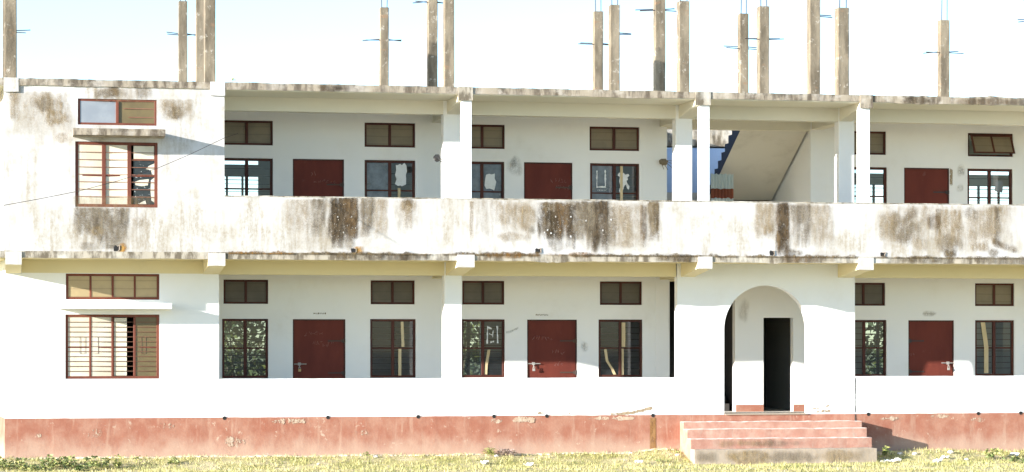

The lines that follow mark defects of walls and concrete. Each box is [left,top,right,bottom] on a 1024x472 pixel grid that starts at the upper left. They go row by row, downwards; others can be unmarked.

damp [75,208,129,244]
damp [313,198,384,244]
damp [507,200,615,251]
damp [640,201,659,240]
damp [756,203,810,255]
damp [928,210,960,257]